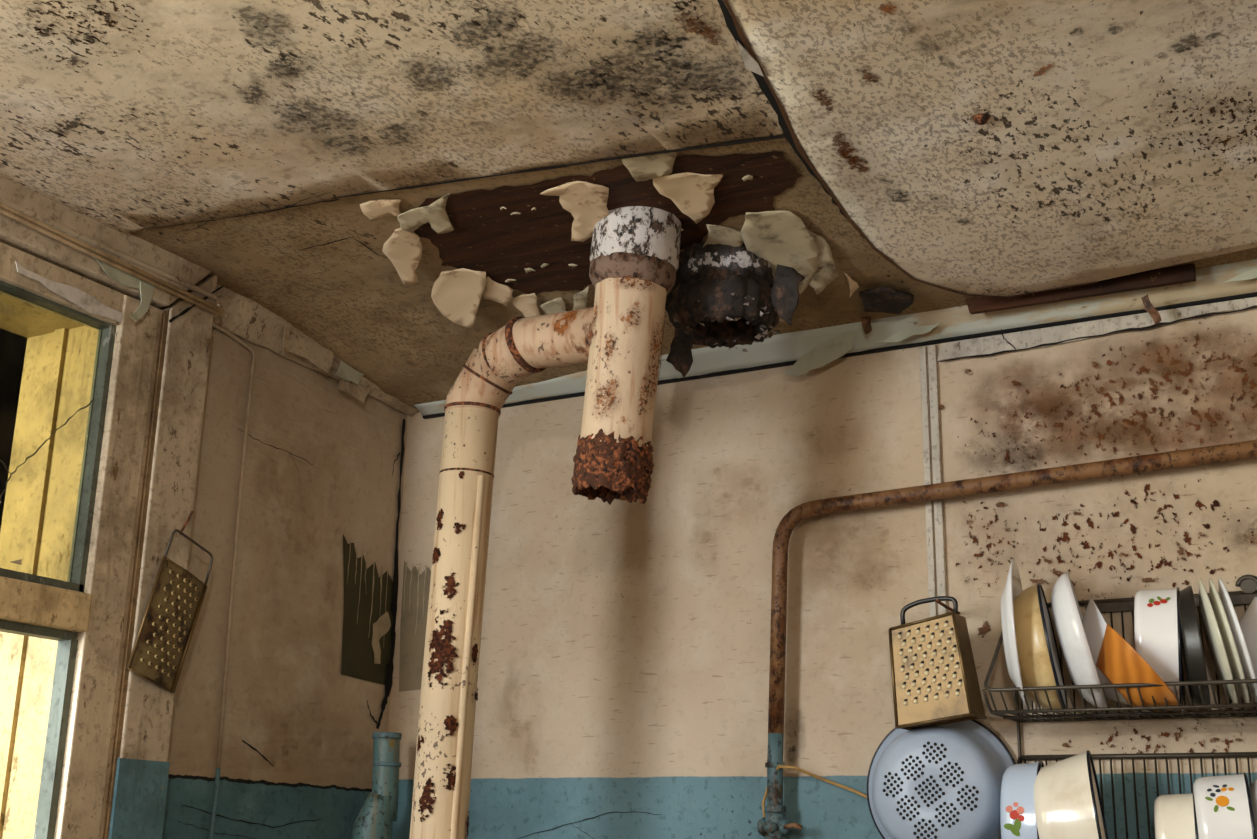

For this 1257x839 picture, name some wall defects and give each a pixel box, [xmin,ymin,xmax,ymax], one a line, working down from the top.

water stain [239,6,310,78]
water stain [1171,33,1219,53]
water stain [243,84,423,157]
crack [140,0,865,239]
crack [299,237,378,255]
peeling [360,151,859,329]
peeling [783,332,855,376]
rust [1004,318,1257,464]
peeling [341,534,431,692]
crack [367,419,406,729]
rust [978,621,991,638]
rust [956,473,1257,601]